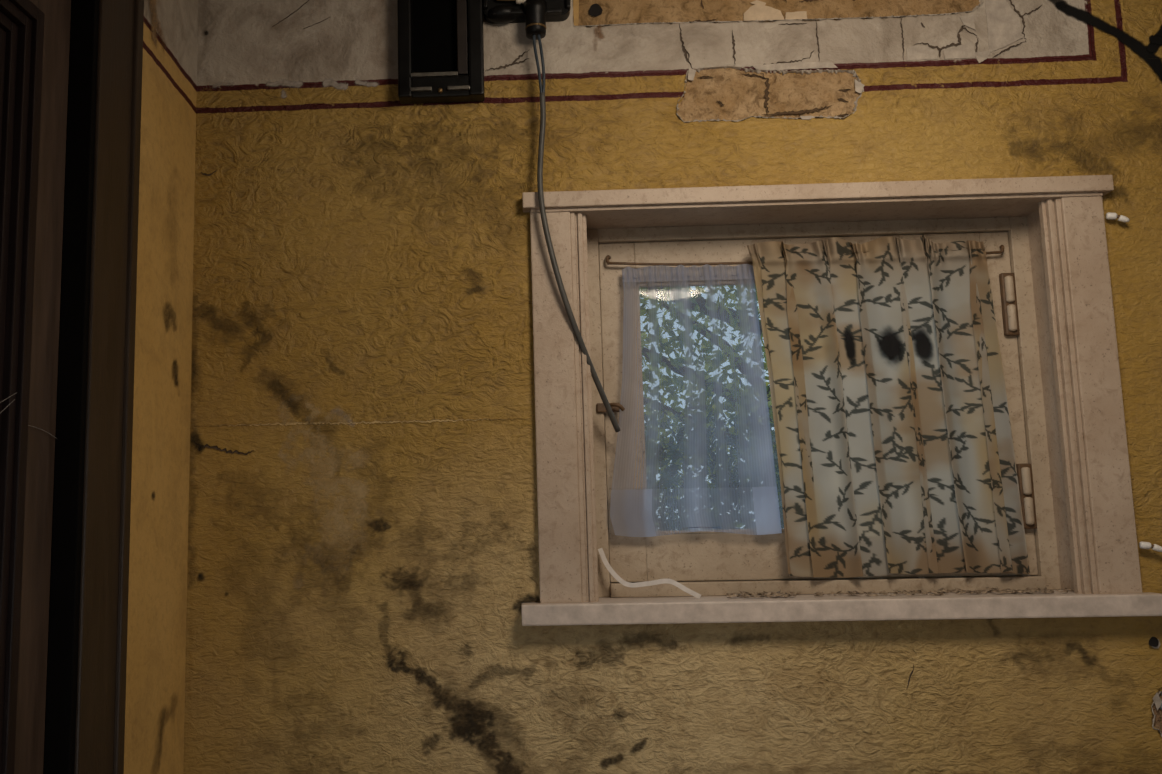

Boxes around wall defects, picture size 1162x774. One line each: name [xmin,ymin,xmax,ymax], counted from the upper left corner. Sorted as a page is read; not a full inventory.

crack [679,23,693,69]
crack [732,20,820,68]
spalling [573,0,983,28]
crack [899,0,1042,63]
spalling [676,62,864,123]
leakage [514,595,539,611]
leakage [388,648,521,774]
spalling [1151,691,1162,737]